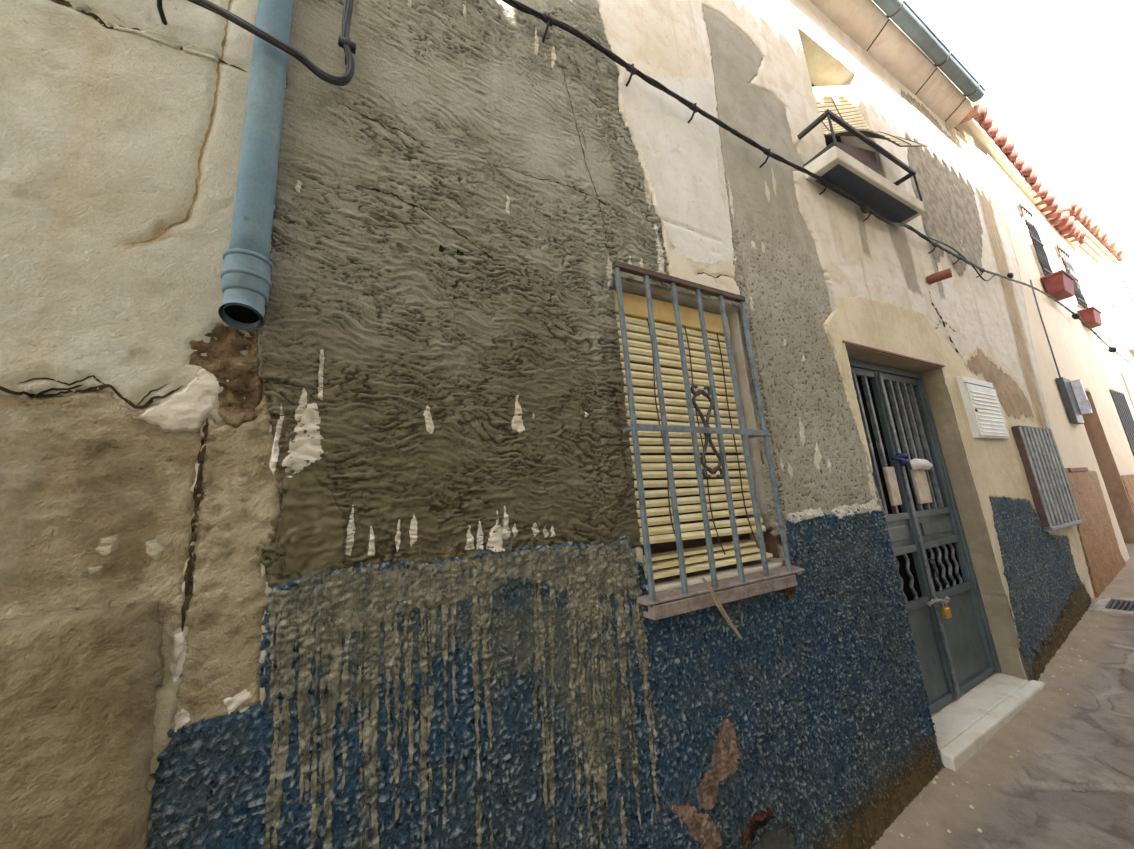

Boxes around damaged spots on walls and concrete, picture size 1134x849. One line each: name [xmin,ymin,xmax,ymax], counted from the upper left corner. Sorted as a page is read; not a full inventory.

crack [52,0,246,244]
crack [0,375,182,409]
crack [181,418,209,631]
damp [262,561,458,849]
damp [471,557,494,849]
flaking render [0,0,1045,732]
damp [531,547,660,849]
peeling [1048,525,1090,596]